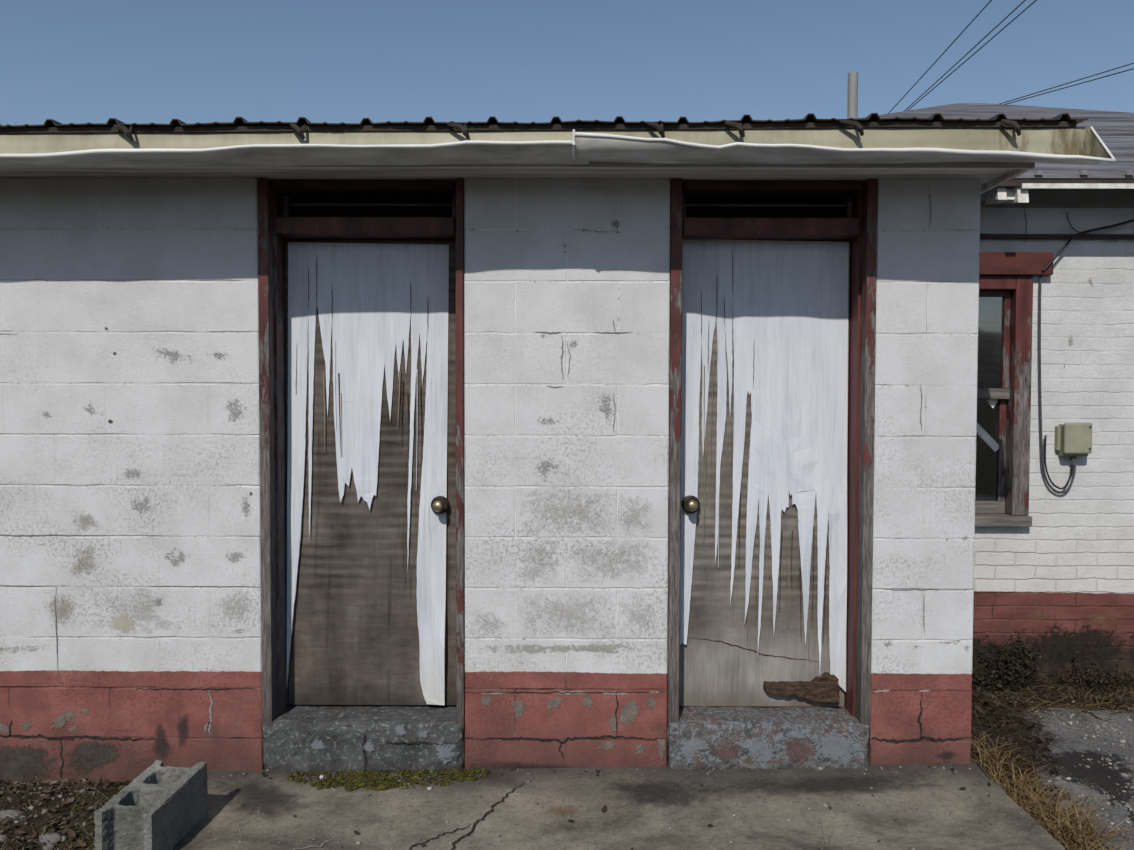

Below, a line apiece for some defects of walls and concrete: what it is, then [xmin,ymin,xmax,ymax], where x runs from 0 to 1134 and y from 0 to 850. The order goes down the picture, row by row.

damp [489,643,631,653]
damp [972,636,1003,672]
damp [1023,623,1134,673]
crack [362,691,665,768]
peeling [547,691,659,750]
peeling [679,730,865,763]
crack [868,701,970,765]
crack [409,782,524,850]
crack [1109,795,1134,821]